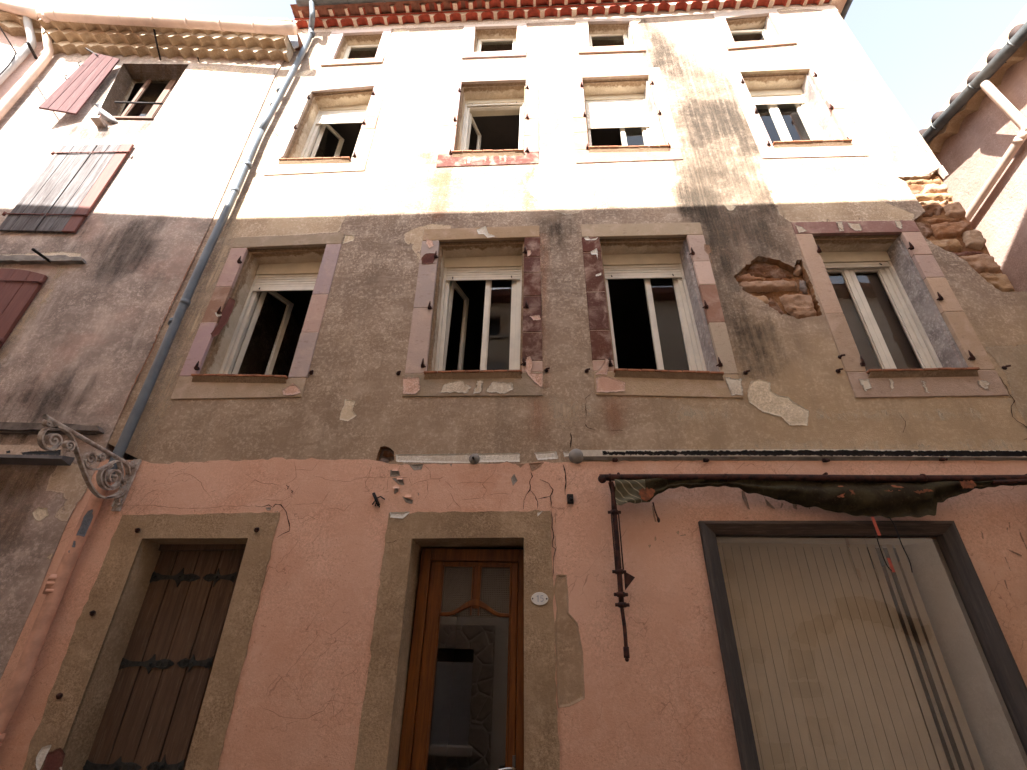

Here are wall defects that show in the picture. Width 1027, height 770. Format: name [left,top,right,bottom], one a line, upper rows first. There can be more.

peeling [526,145,600,215]
damp [653,34,776,271]
flaking render [757,133,1015,292]
flaking render [735,261,817,319]
peeling [725,377,809,426]
crack [131,391,623,573]
peeling [36,745,65,770]